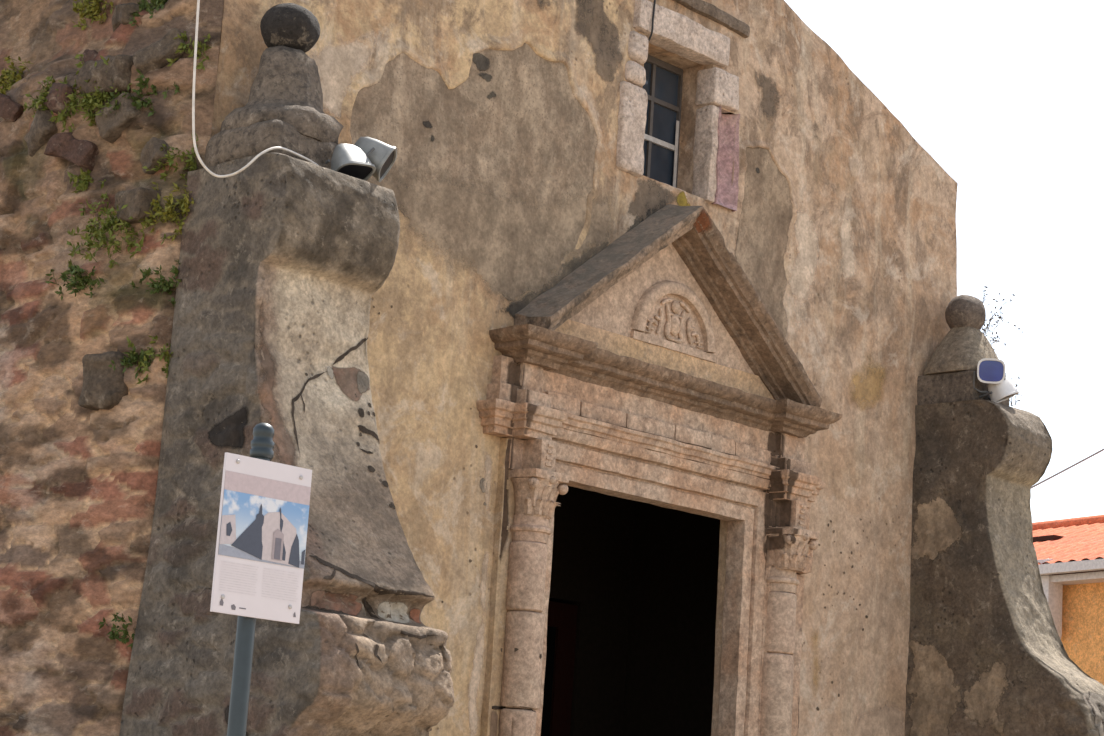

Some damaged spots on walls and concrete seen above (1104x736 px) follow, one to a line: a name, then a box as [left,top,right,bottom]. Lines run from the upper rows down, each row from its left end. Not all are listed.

peeling [339,29,611,314]
peeling [729,140,799,345]
crack [292,338,368,453]
spalling [327,366,375,417]
crack [358,425,379,454]